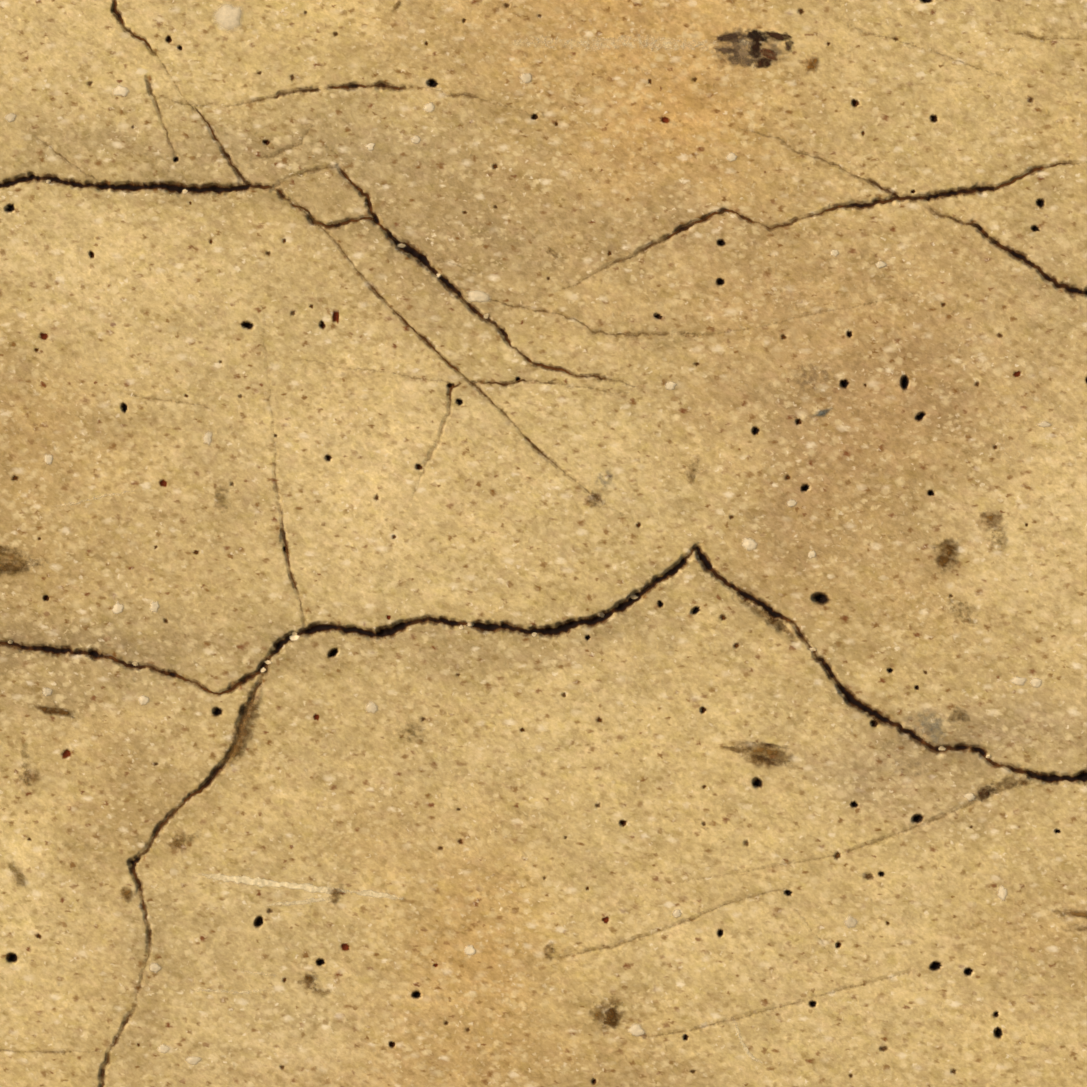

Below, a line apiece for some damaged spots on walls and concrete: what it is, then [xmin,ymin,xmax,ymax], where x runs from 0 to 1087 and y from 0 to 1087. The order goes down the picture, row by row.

crack [112,0,156,55]
crack [0,82,664,416]
crack [605,152,1087,295]
crack [525,436,558,467]
crack [0,464,1087,961]
crack [100,1014,132,1087]